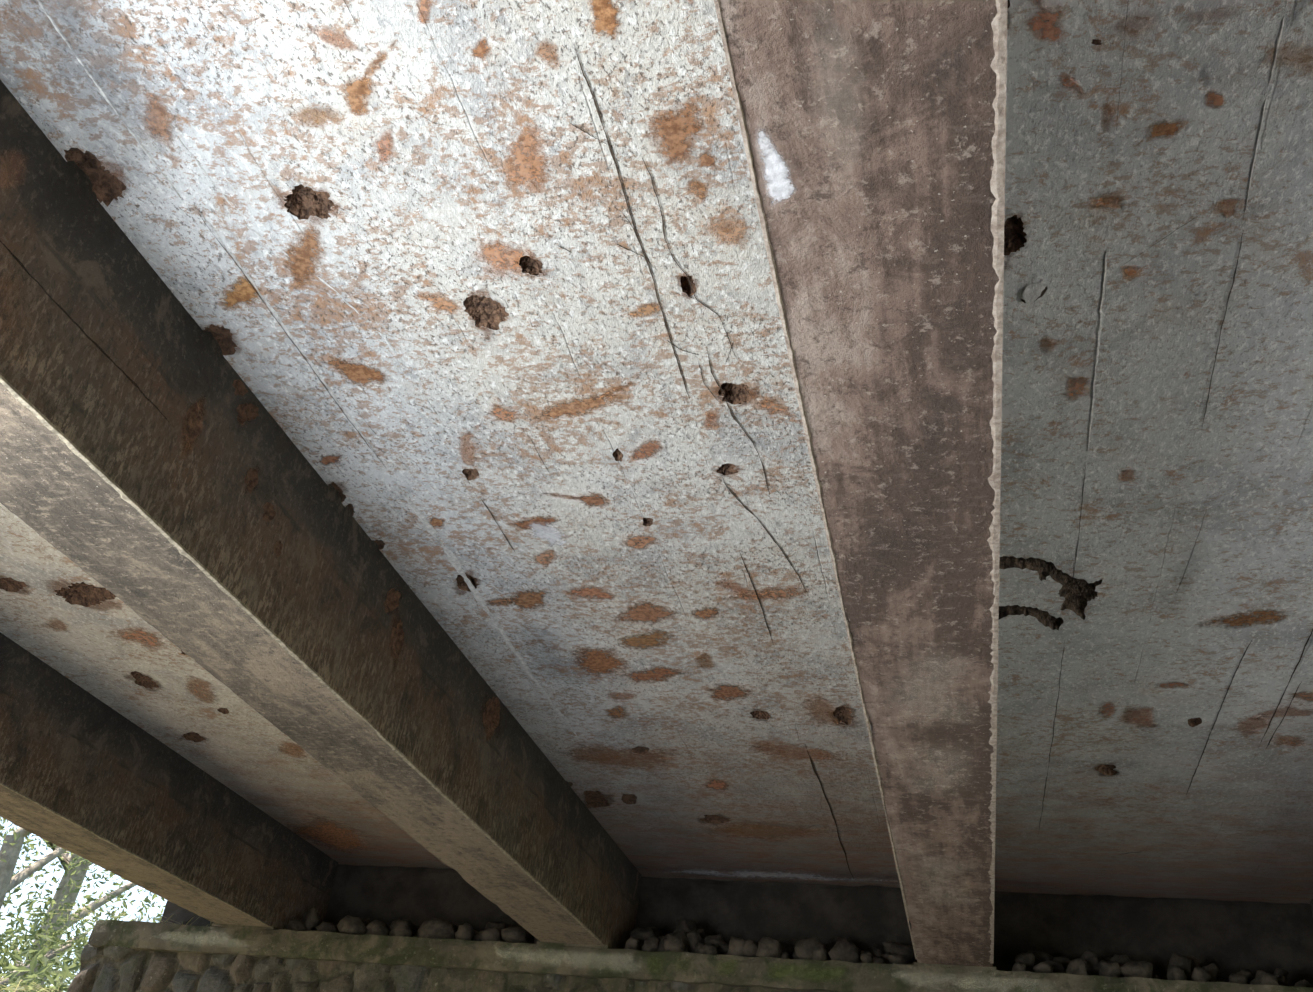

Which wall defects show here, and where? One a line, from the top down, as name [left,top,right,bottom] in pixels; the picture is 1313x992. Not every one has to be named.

corrosion [590,0,620,36]
corrosion [646,103,715,200]
spalling [284,184,335,220]
spalling [1004,215,1027,256]
crack [202,218,385,467]
spalling [463,295,509,330]
crack [569,44,806,591]
corrosion [543,382,631,419]
crack [740,553,774,645]
spalling [999,556,1102,631]
corrosion [573,603,680,718]
crack [1255,629,1313,754]